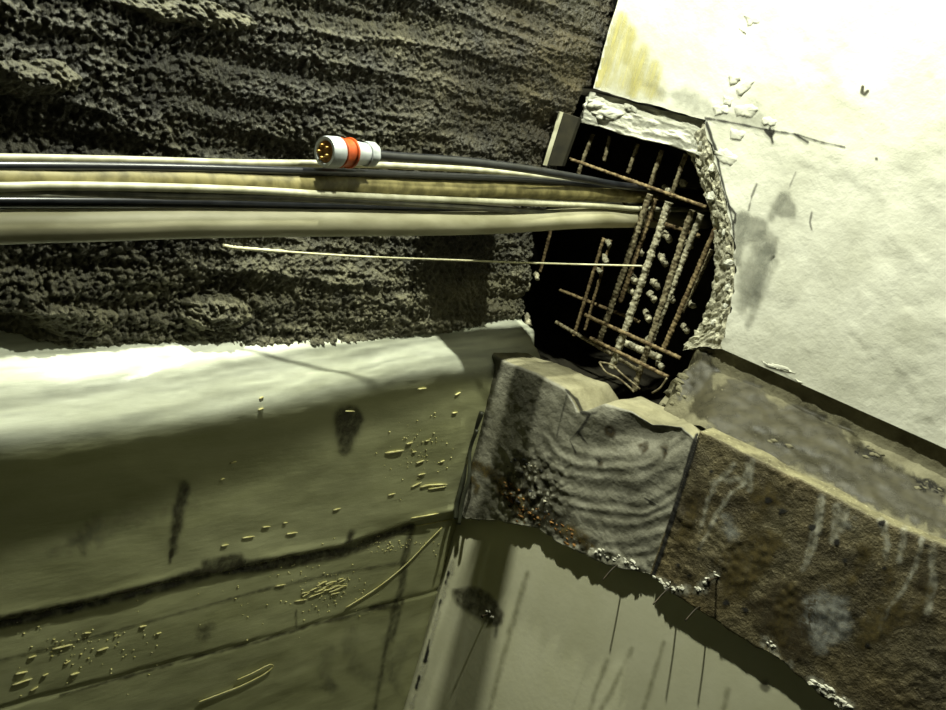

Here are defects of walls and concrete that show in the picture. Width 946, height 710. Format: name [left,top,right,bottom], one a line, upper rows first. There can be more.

crack [705,117,845,240]
spalling [528,230,553,290]
spalling [555,91,746,407]
water stain [733,194,795,309]
water stain [336,407,362,453]
water stain [169,484,189,563]
rust [470,462,595,549]